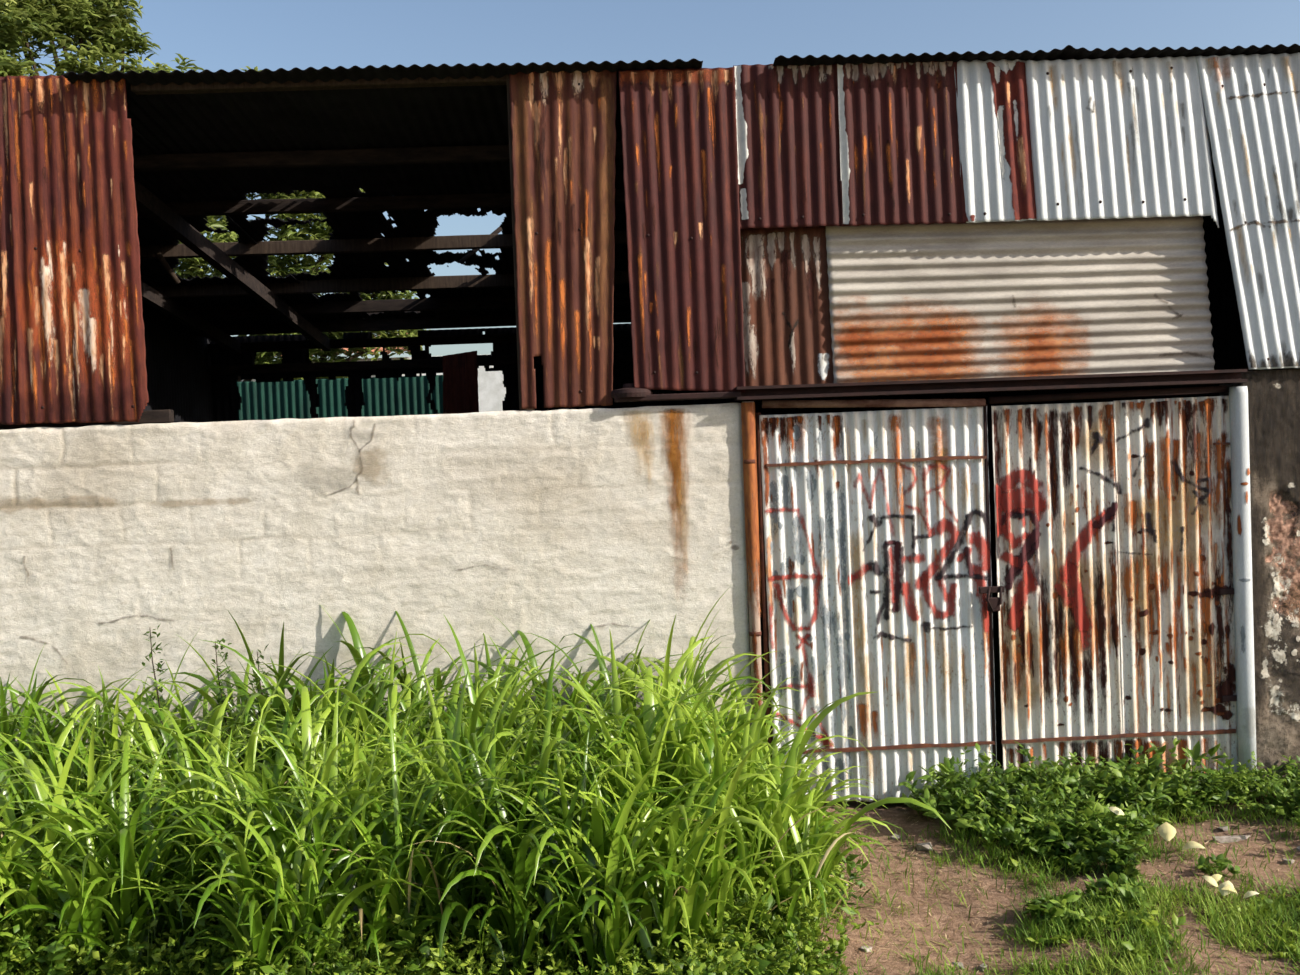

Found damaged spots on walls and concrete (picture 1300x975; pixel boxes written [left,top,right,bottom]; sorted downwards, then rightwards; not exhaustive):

rust [0,78,139,422]
rust [516,70,613,363]
rust [855,65,957,215]
rust [986,61,1037,220]
rust [838,314,979,383]
rust [1007,315,1080,377]
crack [335,424,375,494]
rust [667,409,684,536]
peeling [1237,468,1250,535]
water stain [1242,346,1300,524]
water stain [1251,505,1300,712]
spalling [1261,483,1300,725]